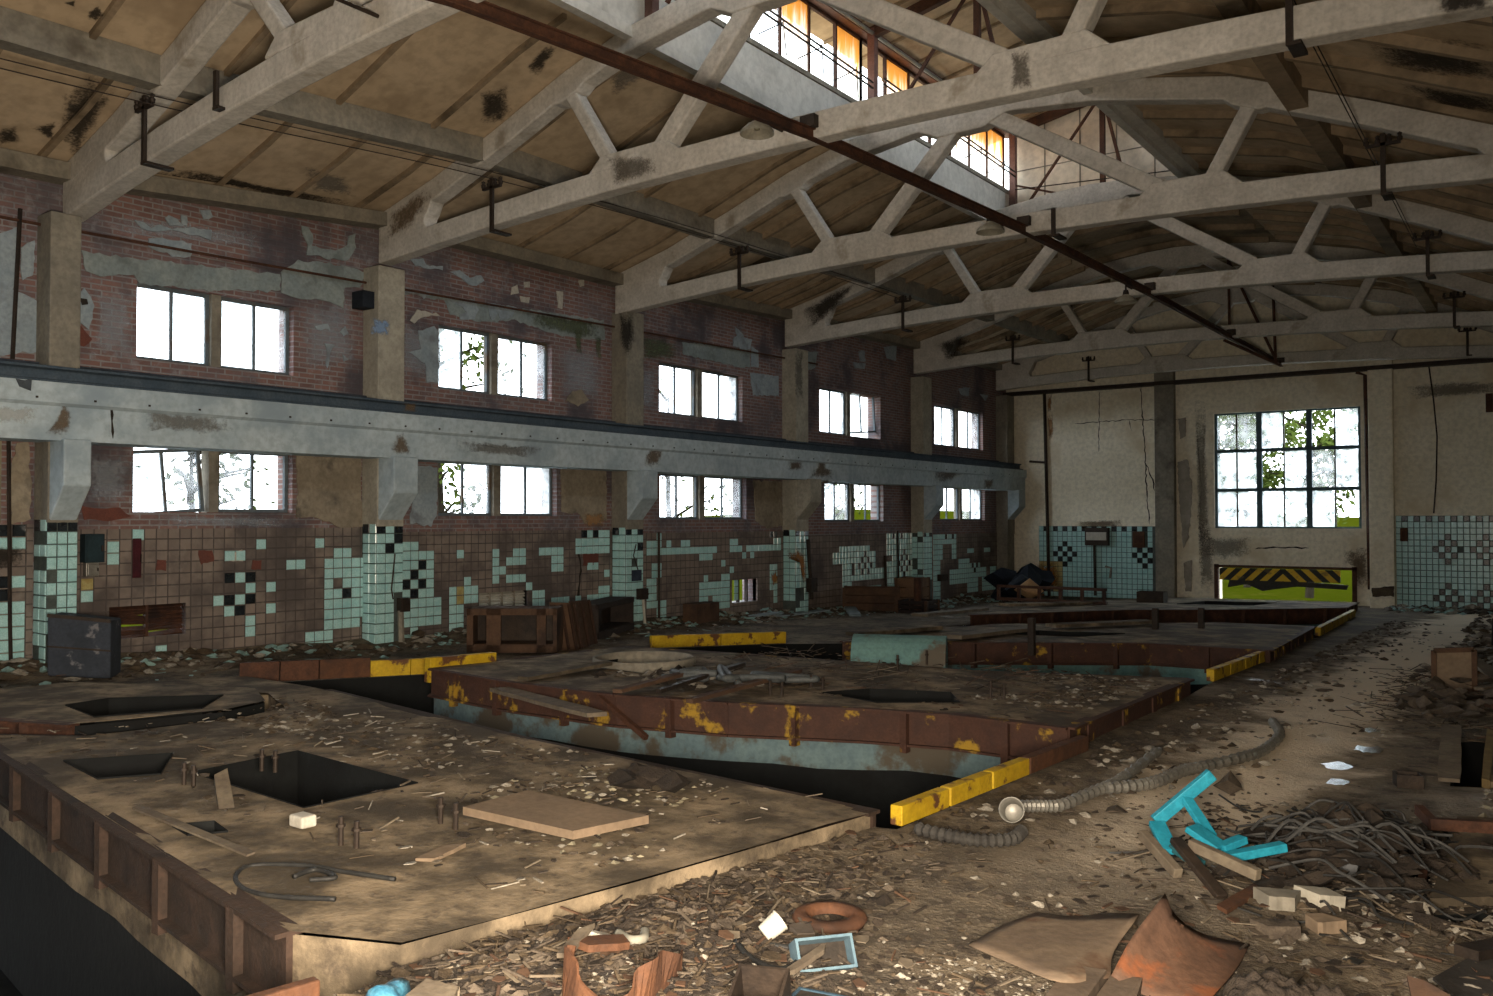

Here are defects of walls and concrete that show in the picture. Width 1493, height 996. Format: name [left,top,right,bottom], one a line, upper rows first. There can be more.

leakage [1442,0,1485,12]
leakage [38,79,108,152]
leakage [483,89,508,121]
peeling [0,227,37,356]
peeling [80,210,364,347]
peeling [405,258,605,383]
peeling [0,442,33,659]
peeling [643,480,783,618]